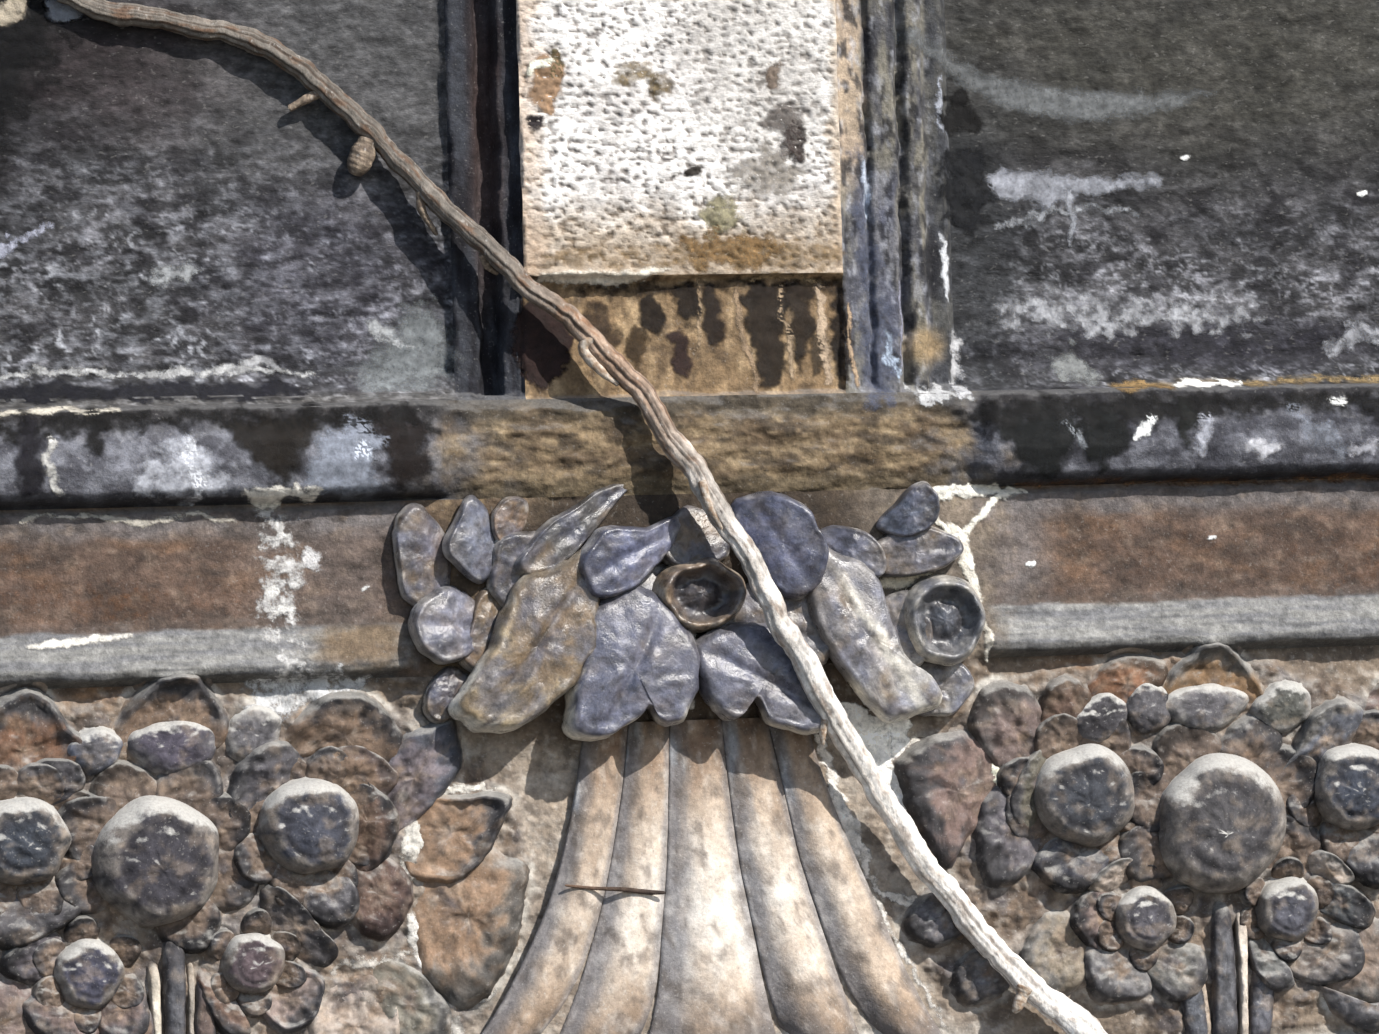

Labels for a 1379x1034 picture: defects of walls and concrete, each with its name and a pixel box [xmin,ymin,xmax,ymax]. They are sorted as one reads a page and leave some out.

water stain [894,29,1208,123]
water stain [0,223,53,258]
water stain [150,259,197,287]
water stain [537,160,903,404]
water stain [989,170,1160,245]
water stain [511,300,574,391]
water stain [933,288,1379,601]
water stain [0,301,453,722]
water stain [984,621,994,662]